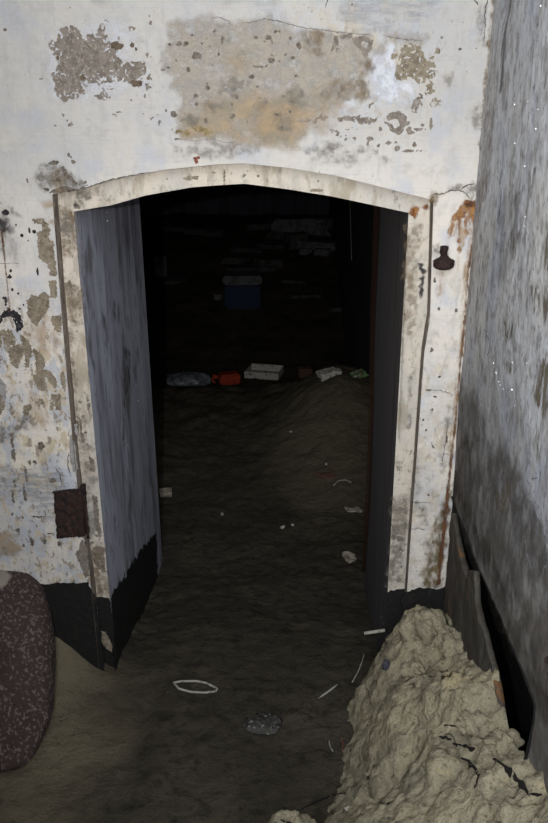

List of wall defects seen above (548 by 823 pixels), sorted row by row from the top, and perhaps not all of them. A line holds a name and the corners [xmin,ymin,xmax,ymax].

peeling [39,20,152,103]
spalling [171,118,213,140]
spalling [168,29,224,72]
spalling [247,30,301,99]
peeling [298,33,445,153]
spalling [44,152,87,194]
rust [448,200,475,287]
peeling [0,218,66,418]
rust [437,302,467,585]
spalling [11,460,44,519]